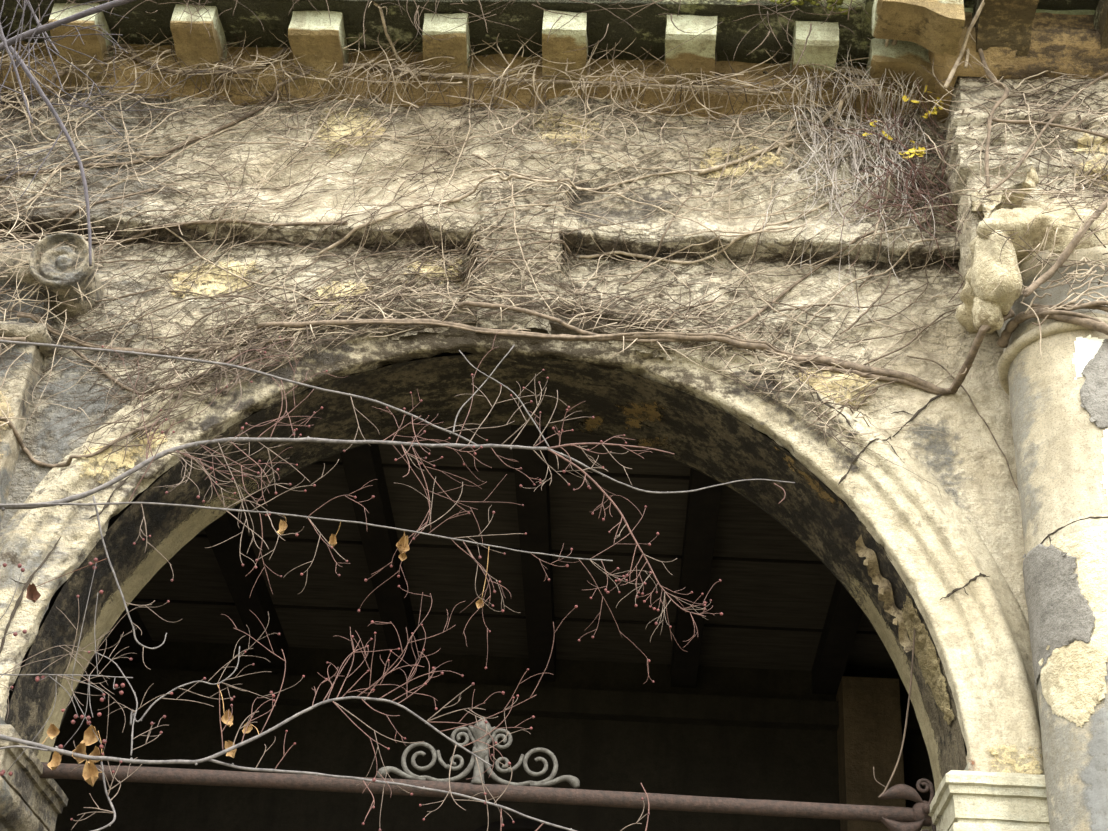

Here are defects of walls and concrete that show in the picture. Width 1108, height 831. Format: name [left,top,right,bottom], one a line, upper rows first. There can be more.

flaking render [1080,335,1108,429]
peeling [0,391,14,468]
crack [1040,516,1108,544]
spalling [855,535,955,725]
crack [940,573,989,600]
flaking render [1022,524,1108,831]